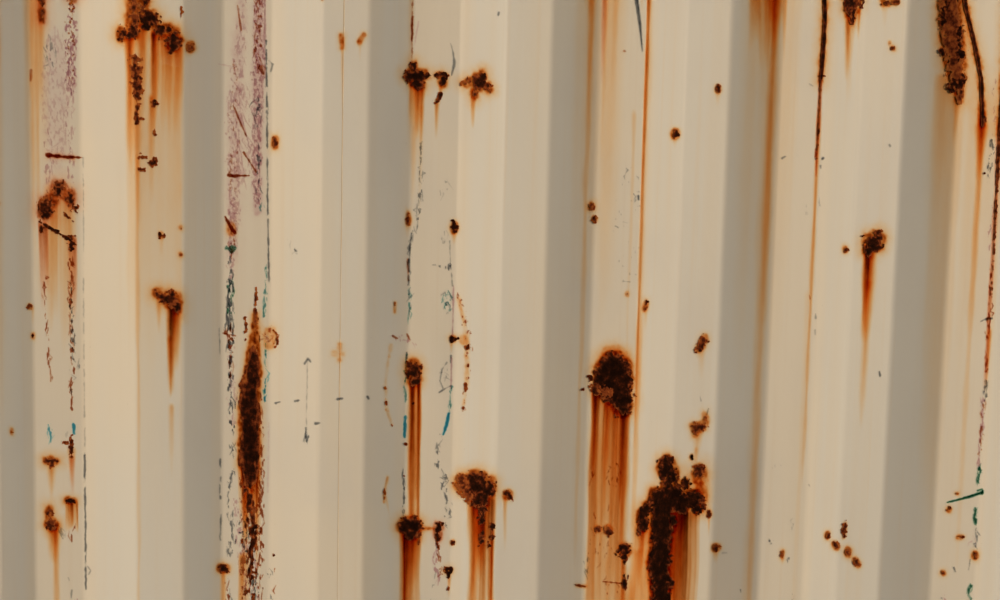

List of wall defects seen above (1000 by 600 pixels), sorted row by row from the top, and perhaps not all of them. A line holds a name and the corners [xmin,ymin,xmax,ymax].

rust [116,0,195,125]
rust [403,61,450,104]
rust [460,70,494,100]
rust [937,0,968,105]
rust [36,179,80,252]
rust [861,229,886,298]
rust [153,288,183,361]
rust [237,287,279,505]
rust [405,359,423,480]
rust [581,350,637,476]
rust [452,469,514,583]
rust [615,454,712,600]